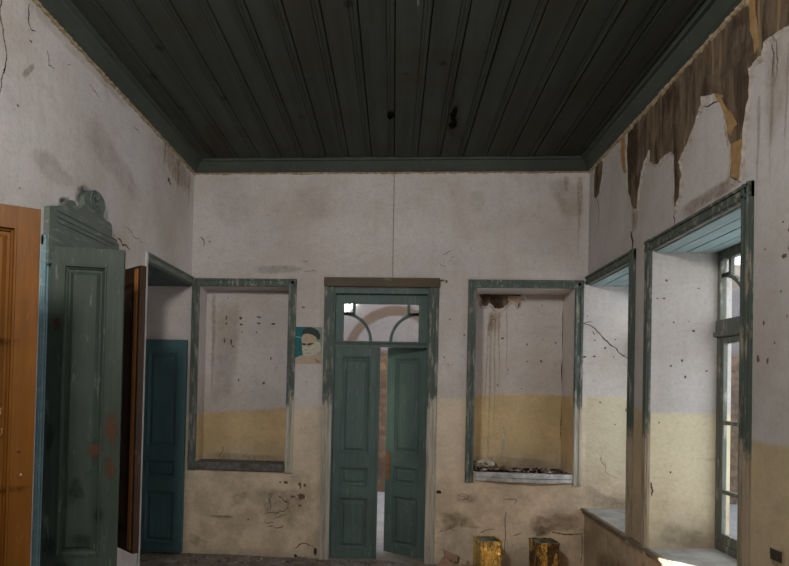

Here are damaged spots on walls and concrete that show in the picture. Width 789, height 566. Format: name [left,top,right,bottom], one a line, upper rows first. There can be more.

crack [0,0,8,92]
peeling [620,0,789,214]
peeling [593,159,604,223]
peeling [477,294,528,317]
crack [558,314,566,381]
crack [583,322,627,358]